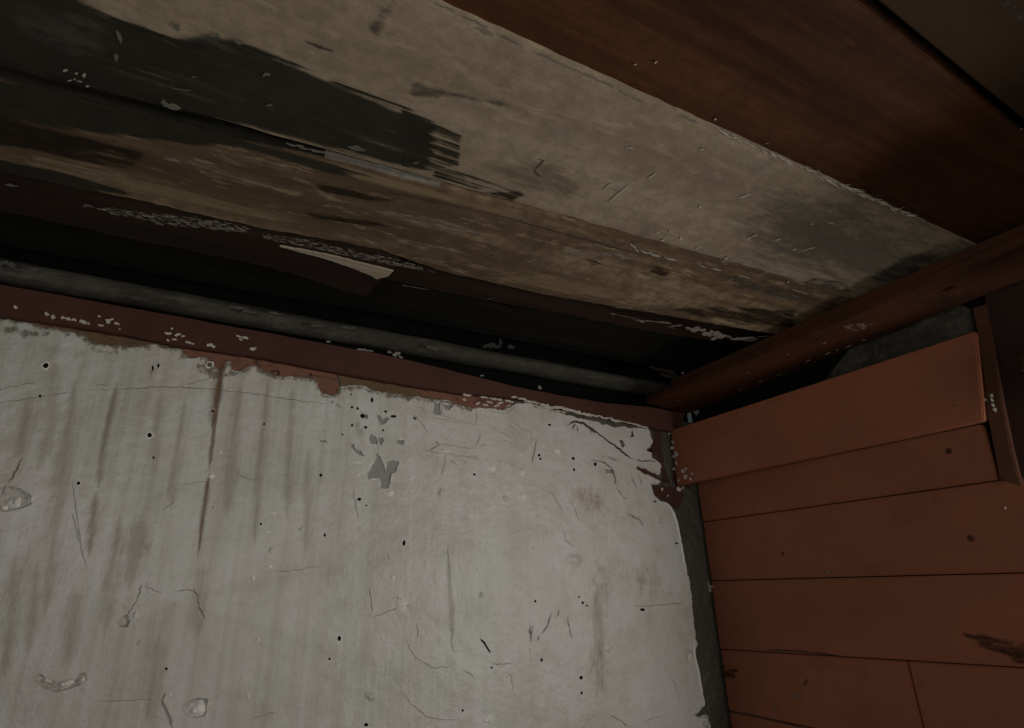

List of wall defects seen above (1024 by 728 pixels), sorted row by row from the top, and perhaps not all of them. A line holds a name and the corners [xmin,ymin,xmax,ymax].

leakage [0,0,524,201]
peeling [44,312,121,330]
peeling [611,313,768,342]
rust [210,369,222,463]
peeling [433,385,649,448]
peeling [351,414,399,489]
crack [569,421,656,493]
peeling [661,433,693,497]
spalling [0,486,34,512]
spalling [32,672,87,693]